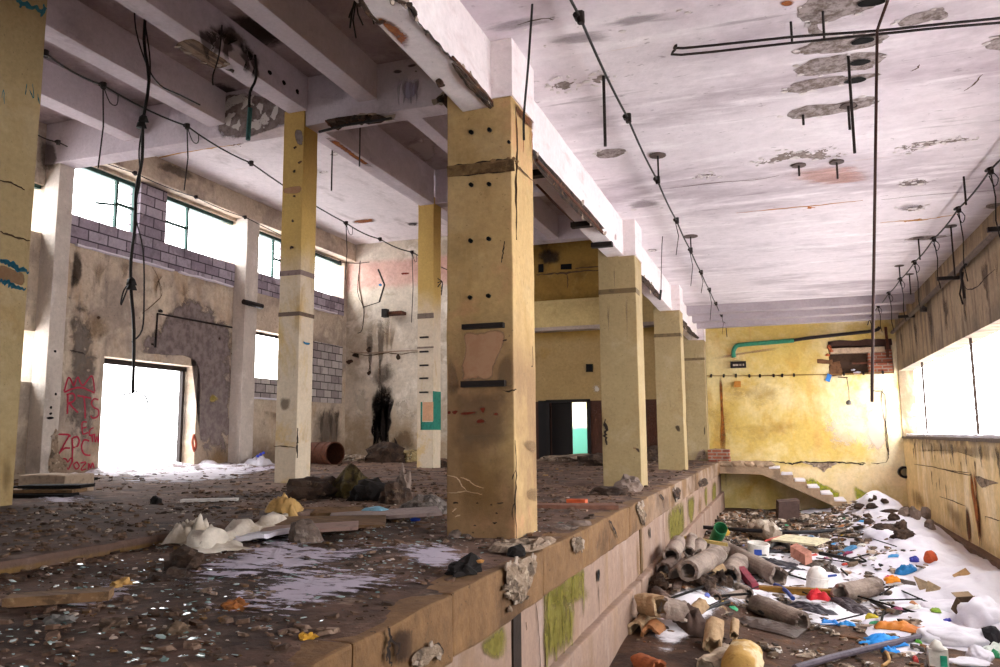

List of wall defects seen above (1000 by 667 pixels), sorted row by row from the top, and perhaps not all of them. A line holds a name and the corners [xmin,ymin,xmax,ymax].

rust [378,18,408,44]
spalling [452,56,494,109]
peeling [218,92,286,148]
spalling [318,113,396,133]
peeling [749,146,846,166]
peeling [893,136,979,155]
flaking render [462,331,504,380]
water stain [371,398,393,445]
crack [772,389,889,465]
water stain [545,571,584,667]